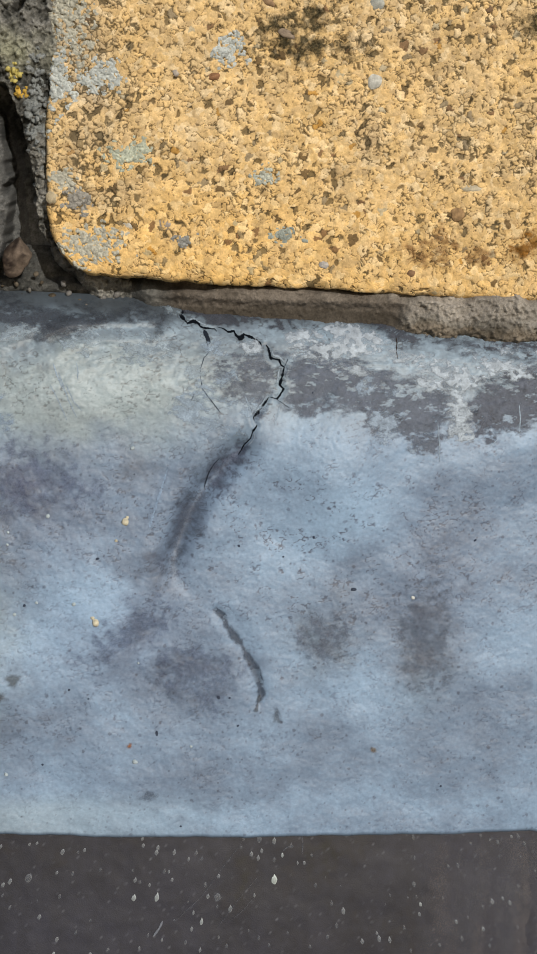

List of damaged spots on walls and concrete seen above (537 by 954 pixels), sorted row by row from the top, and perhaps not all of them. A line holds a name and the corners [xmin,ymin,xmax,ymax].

crack [179,310,288,487]